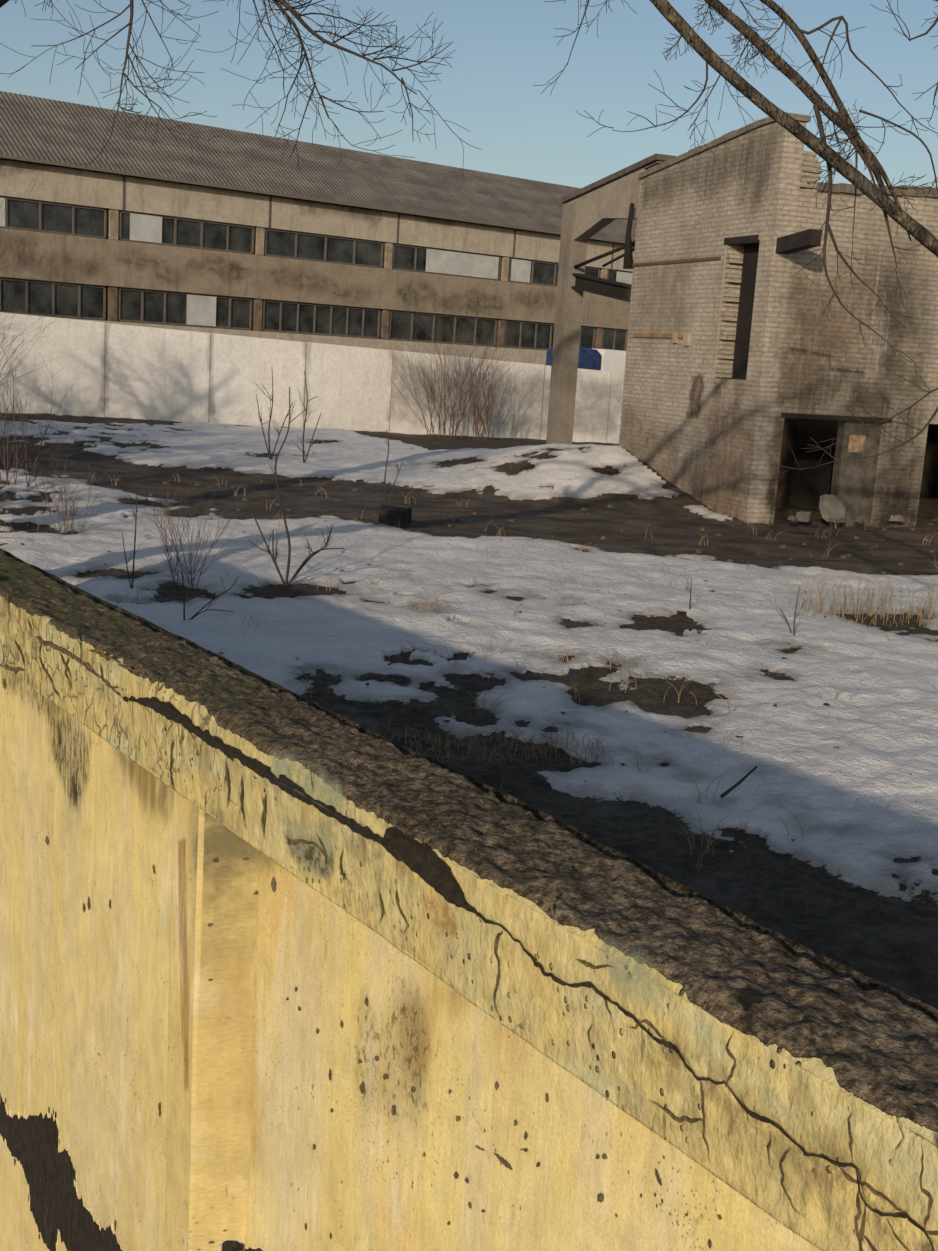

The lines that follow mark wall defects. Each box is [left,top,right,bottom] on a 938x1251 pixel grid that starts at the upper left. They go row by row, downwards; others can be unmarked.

crack [0,591,159,699]
crack [169,741,182,798]
crack [224,729,348,883]
crack [379,885,407,936]
crack [460,901,938,1251]
peeling [0,1092,125,1251]
peeling [217,1238,268,1251]